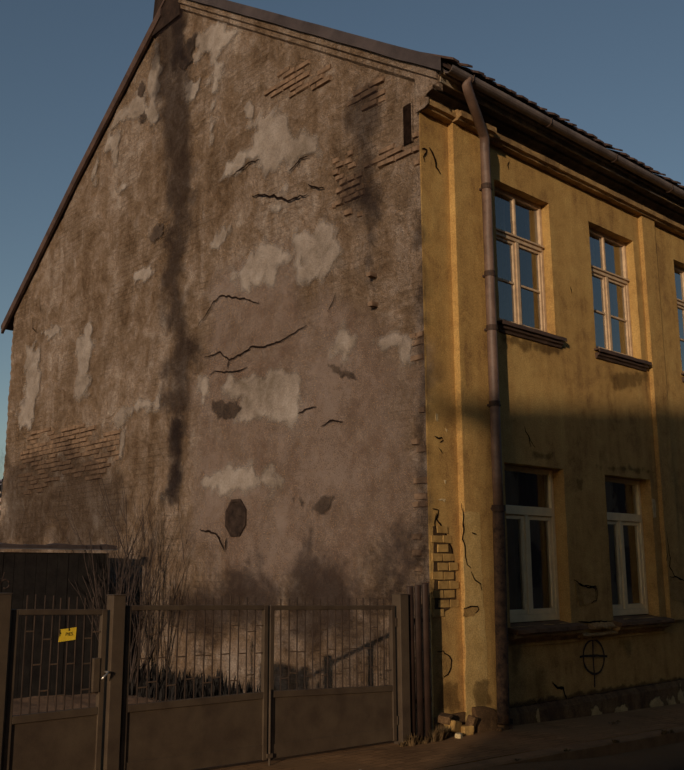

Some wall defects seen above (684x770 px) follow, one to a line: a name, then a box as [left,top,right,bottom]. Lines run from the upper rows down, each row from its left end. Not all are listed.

leakage [155,14,189,325]
crack [422,147,441,174]
crack [252,184,324,202]
crack [198,295,257,325]
crack [205,325,307,374]
crack [200,529,227,551]
flaking render [431,526,479,617]